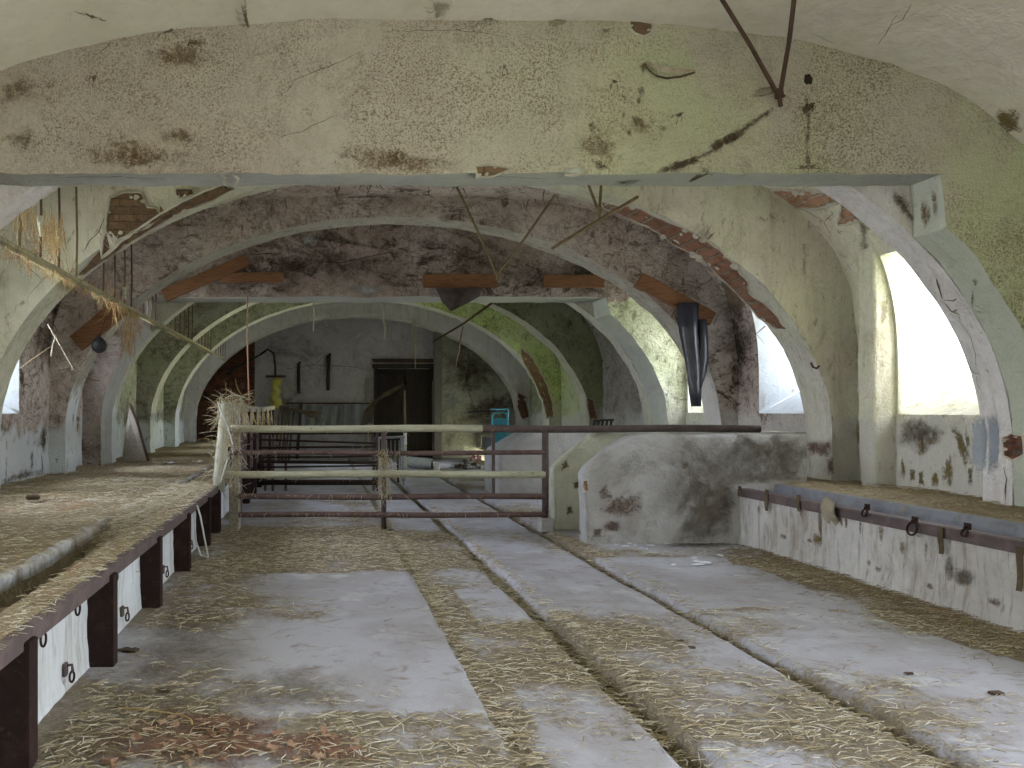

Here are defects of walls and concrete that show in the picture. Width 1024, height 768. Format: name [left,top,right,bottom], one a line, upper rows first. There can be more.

flaking render [644,61,695,79]
leakage [661,108,773,181]
flaking render [475,164,510,179]
flaking render [769,188,860,226]
flaking render [78,186,235,275]
flaking render [602,201,790,330]
flaking render [516,348,555,420]
leakage [901,419,938,450]
flaking render [1001,433,1024,462]